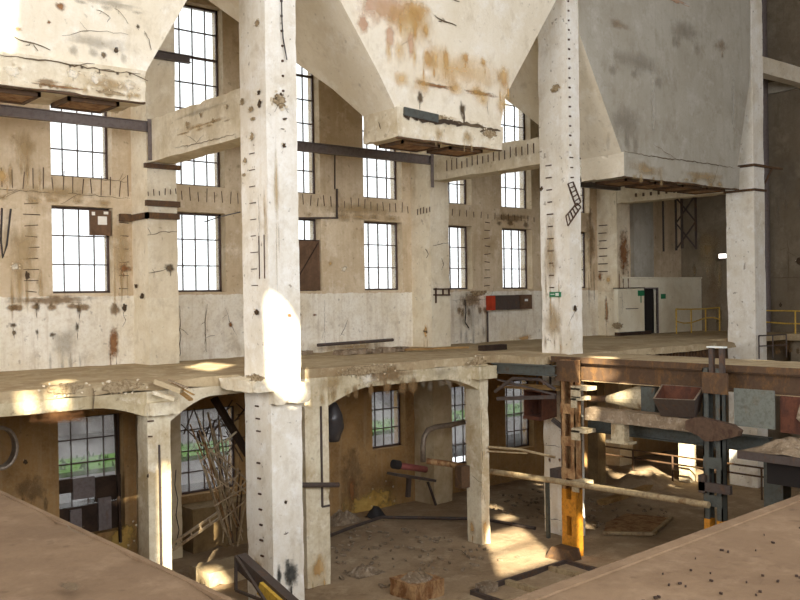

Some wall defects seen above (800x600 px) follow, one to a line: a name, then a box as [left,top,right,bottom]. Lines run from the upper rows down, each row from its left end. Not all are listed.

crack [1,8,152,81]
corrosion [359,0,428,53]
corrosion [419,52,451,89]
corrosion [468,71,509,99]
spalling [239,89,288,130]
spalling [403,107,462,126]
corrosion [598,232,629,288]
corrosion [110,329,118,365]
spalling [38,382,90,397]
spalling [342,363,396,387]